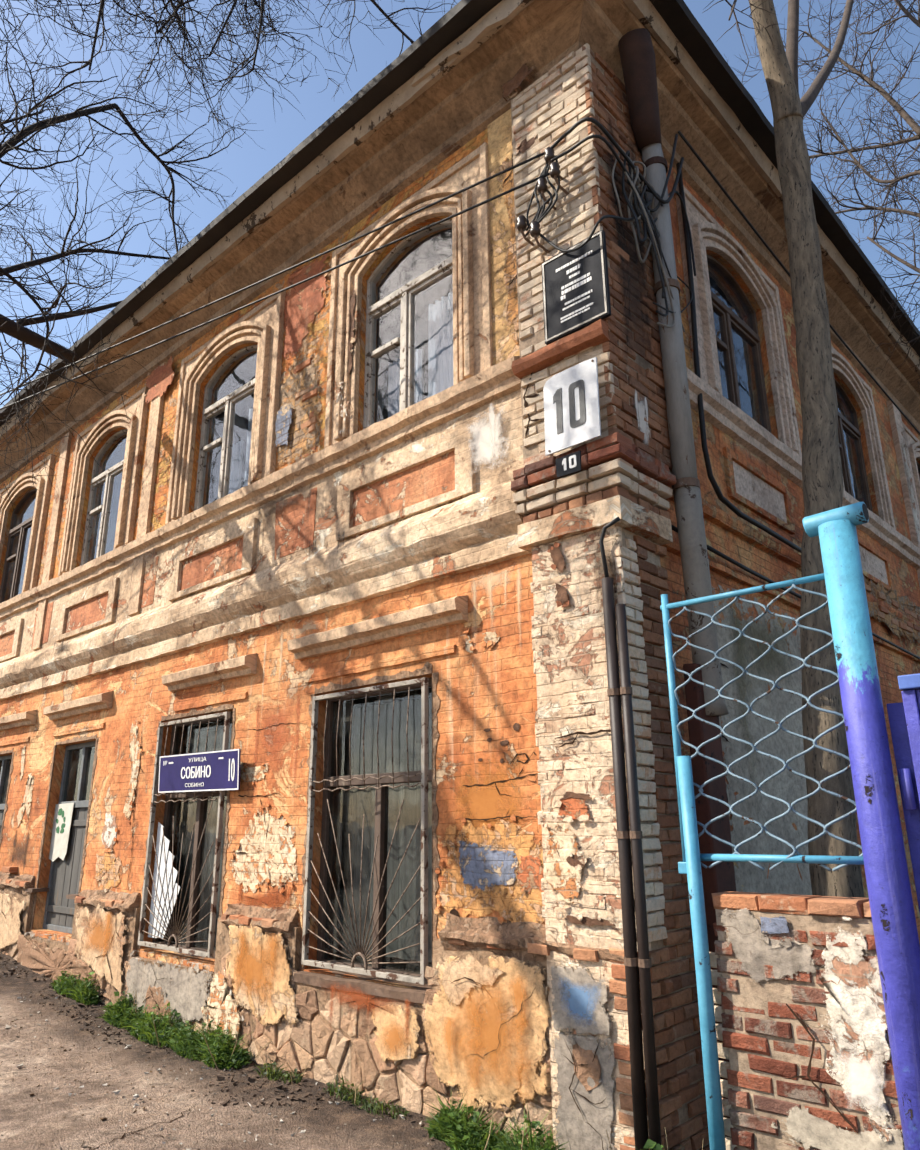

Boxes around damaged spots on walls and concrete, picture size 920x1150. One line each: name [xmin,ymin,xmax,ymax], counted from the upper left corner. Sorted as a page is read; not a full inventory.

spalling [547,542,570,607]
spalling [863,574,920,644]
peeling [14,745,34,831]
peeling [95,720,142,892]
peeling [230,802,298,894]
peeling [434,791,616,927]
crack [455,728,624,821]
crack [452,977,492,997]
crack [468,987,536,1059]
crack [783,1003,866,1149]